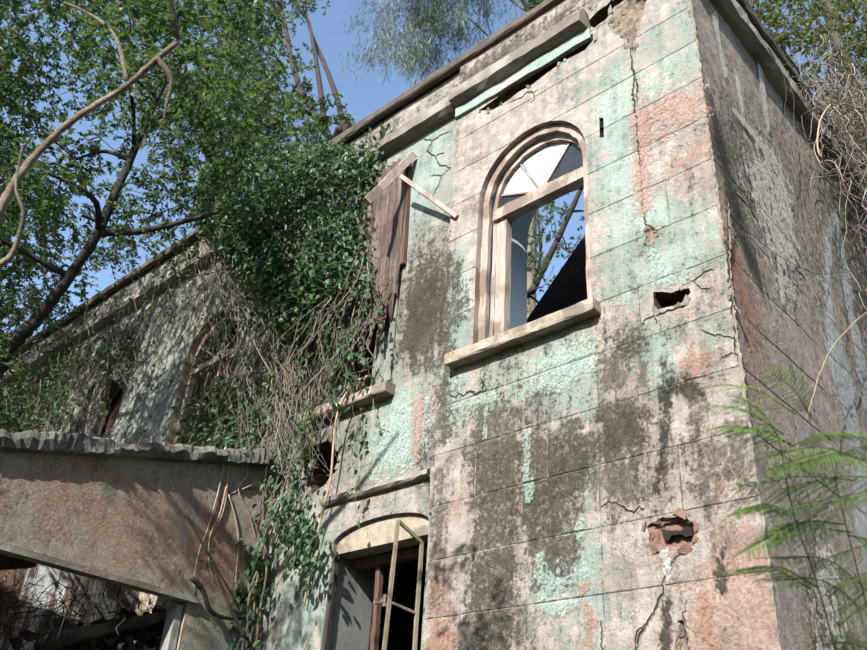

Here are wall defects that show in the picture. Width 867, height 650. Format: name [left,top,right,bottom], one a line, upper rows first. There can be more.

crack [423,131,451,197]
spalling [589,0,646,55]
crack [628,36,647,225]
leakage [711,11,772,157]
leakage [703,88,785,305]
leakage [395,251,474,446]
spalling [643,224,691,317]
crack [644,191,805,361]
hole [304,439,342,495]
leakage [454,349,761,650]
crack [634,553,691,650]
spalling [641,507,700,581]